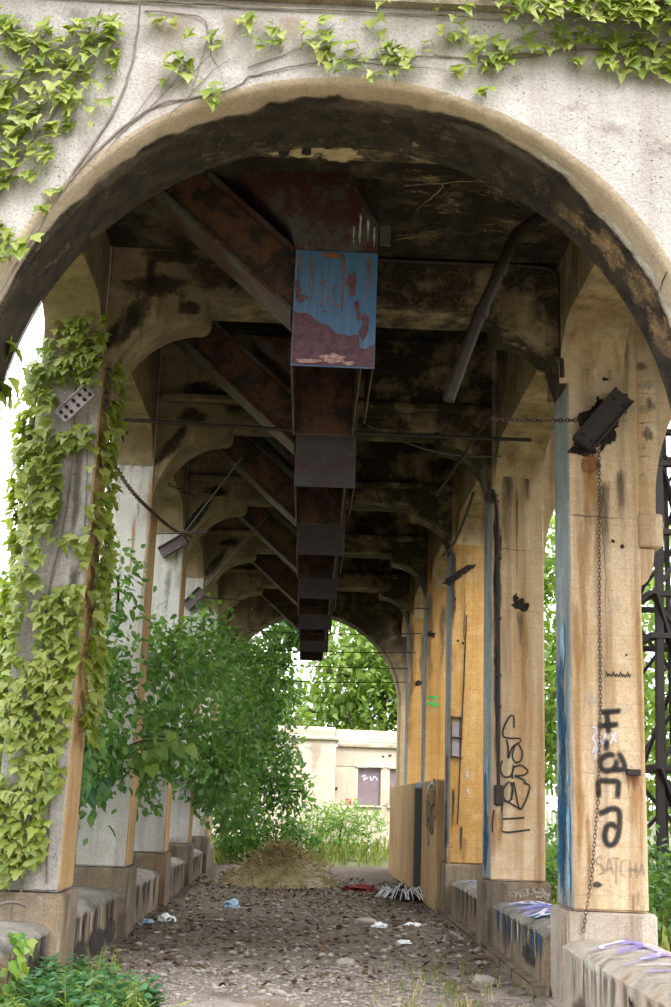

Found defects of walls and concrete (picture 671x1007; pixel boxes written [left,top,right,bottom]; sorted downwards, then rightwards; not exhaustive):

peeling [529,148,575,179]
rust [298,253,345,315]
peeling [576,215,671,319]
rust [295,352,356,366]
rust [574,454,601,697]
leakage [482,465,512,765]
rust [577,791,590,866]